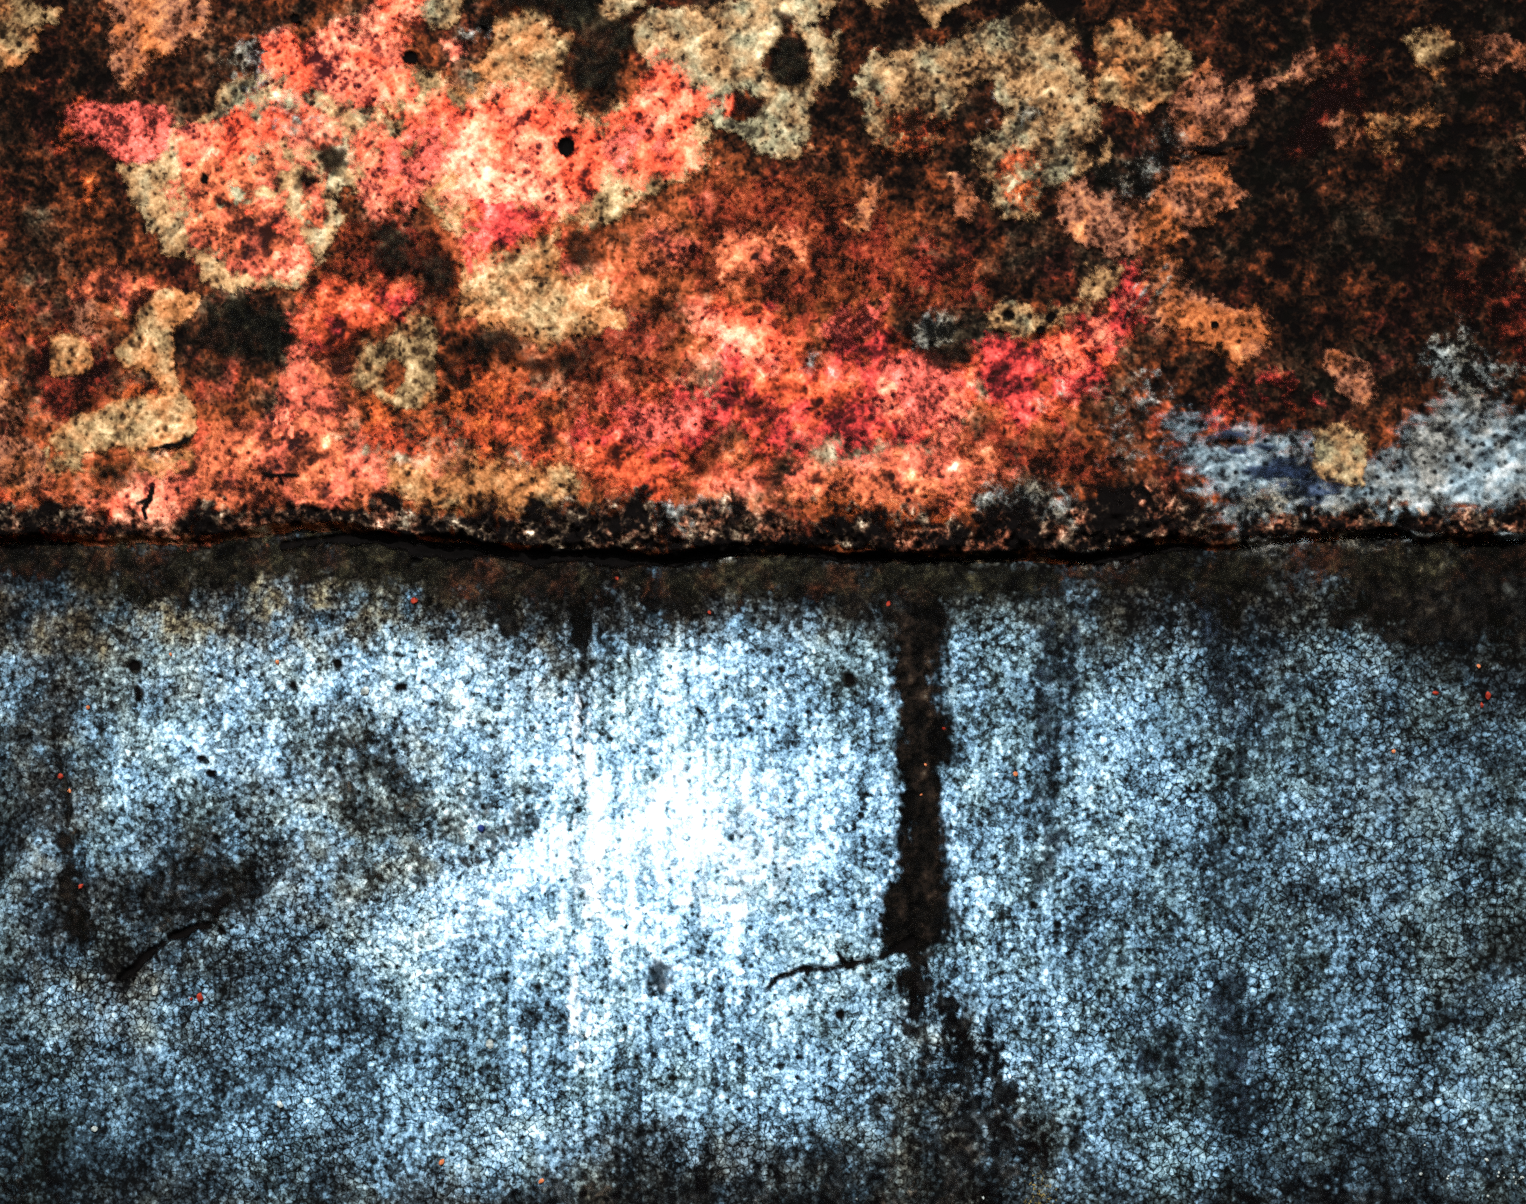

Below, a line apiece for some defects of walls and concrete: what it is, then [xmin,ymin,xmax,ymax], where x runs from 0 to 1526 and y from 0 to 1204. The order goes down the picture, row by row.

corrosion [52,95,85,153]
corrosion [81,175,99,211]
corrosion [681,168,995,314]
corrosion [874,97,944,156]
corrosion [995,148,1044,212]
corrosion [10,315,158,424]
corrosion [353,298,723,505]
corrosion [812,418,1123,525]
water stain [0,528,1526,1204]
crack [765,936,917,991]